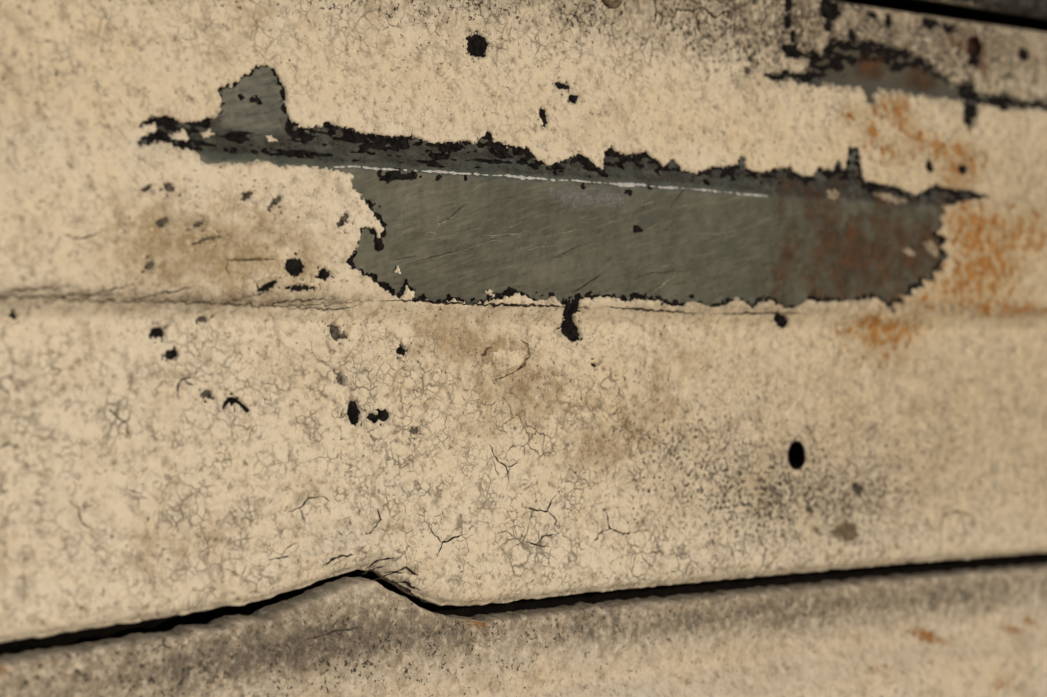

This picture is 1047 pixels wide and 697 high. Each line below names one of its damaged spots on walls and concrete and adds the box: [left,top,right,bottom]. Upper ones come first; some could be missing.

peeling [763,0,1047,132]
peeling [137,65,988,346]
corrosion [835,92,1047,371]
crack [177,377,195,398]
crack [288,496,329,520]
crack [428,525,466,554]
crack [524,500,559,547]
crack [593,510,643,543]
crack [361,566,439,605]